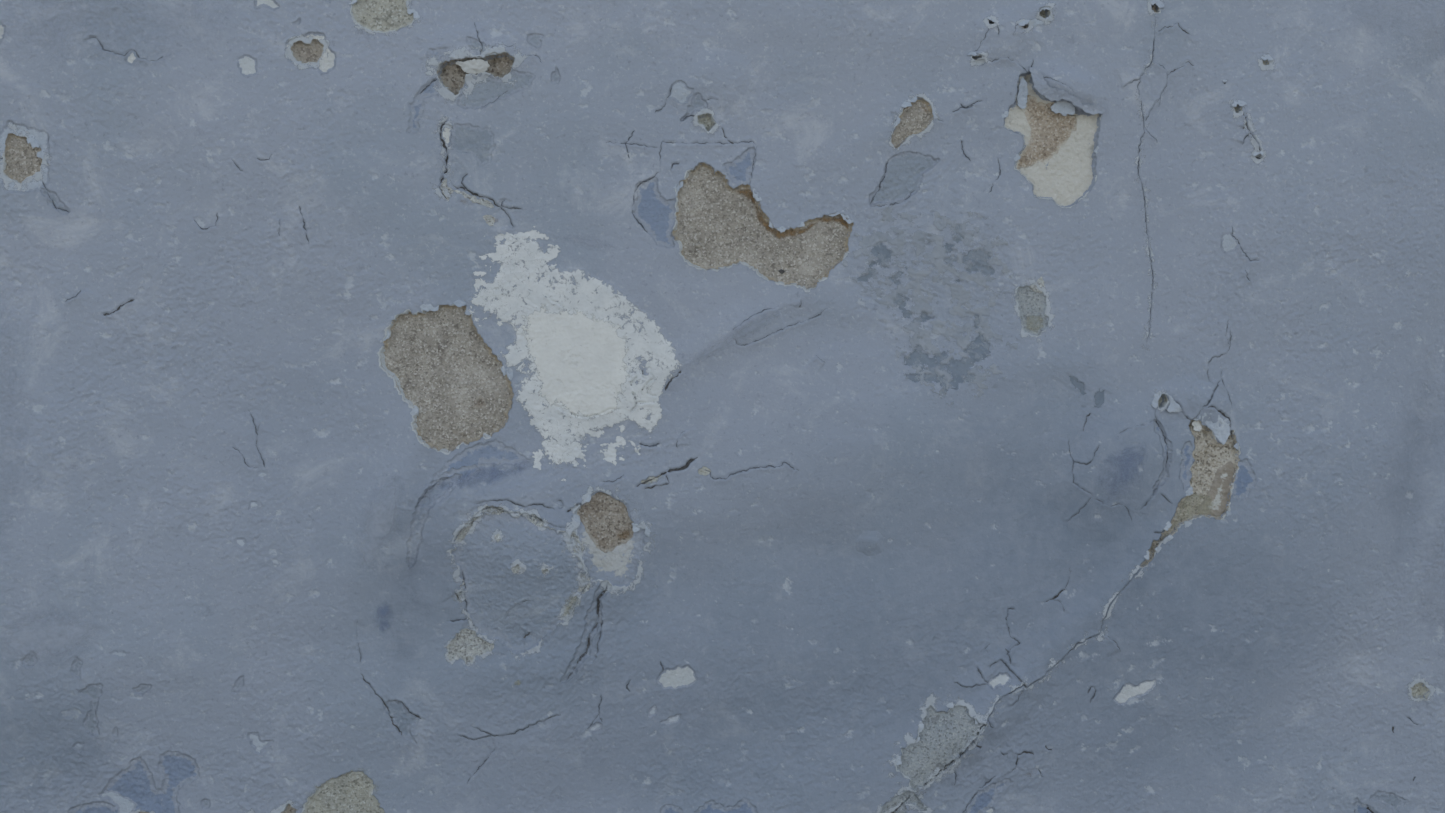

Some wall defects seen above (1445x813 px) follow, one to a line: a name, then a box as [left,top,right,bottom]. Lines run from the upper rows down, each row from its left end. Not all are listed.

spalling [0,120,71,215]
peeling [284,18,336,75]
crack [416,79,521,229]
peeling [406,33,561,167]
spalling [632,147,854,292]
spalling [1001,66,1104,208]
crack [1131,20,1193,350]
spalling [377,300,514,569]
spalling [1140,388,1257,568]
peeling [444,486,656,683]
crack [884,324,1233,813]
spalling [873,693,988,813]